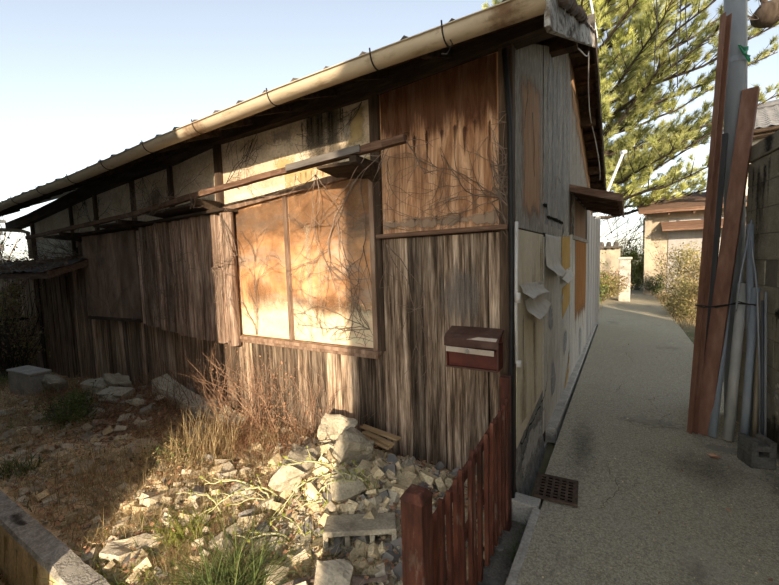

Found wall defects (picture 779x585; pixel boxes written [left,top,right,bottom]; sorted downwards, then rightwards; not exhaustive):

damp [301,108,343,169]
damp [751,134,773,223]
spalling [520,364,555,487]